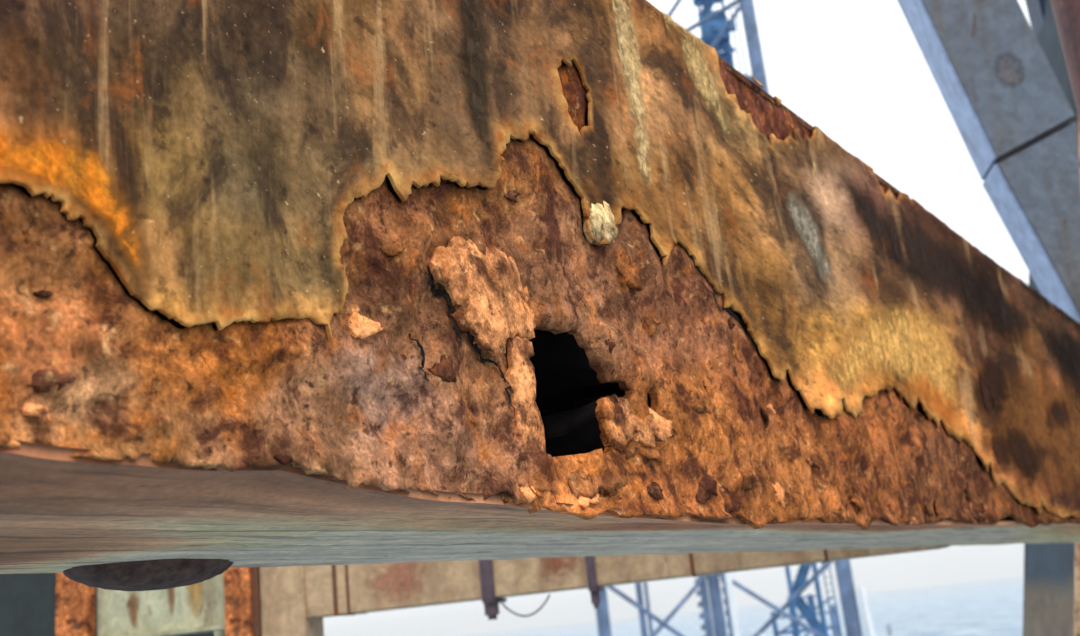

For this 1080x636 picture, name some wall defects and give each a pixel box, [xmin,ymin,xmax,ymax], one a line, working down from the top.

spalling [557,60,588,131]
leakage [791,203,828,269]
corrosion [0,135,1080,530]
leakage [830,309,958,410]